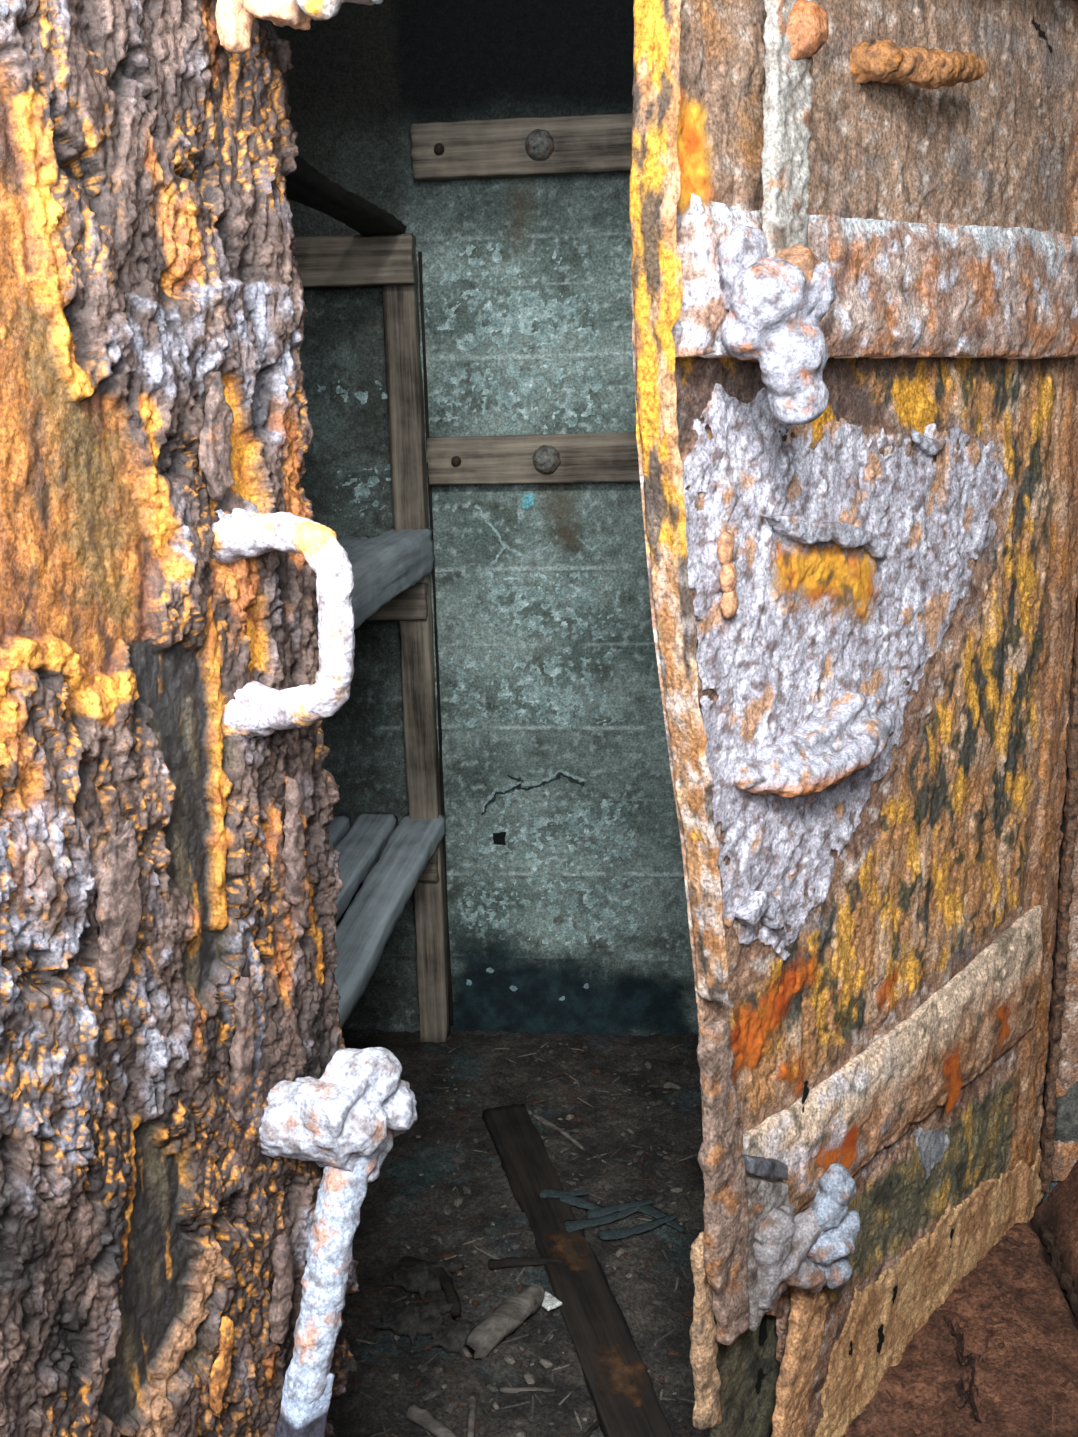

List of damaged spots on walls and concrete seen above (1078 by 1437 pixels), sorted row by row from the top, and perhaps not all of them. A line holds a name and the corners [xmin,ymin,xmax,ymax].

corrosion [676,94,712,212]
corrosion [774,542,875,620]
crack [481,769,586,815]
water stain [450,939,695,1037]
corrosion [730,958,815,1082]
corrosion [877,970,898,1007]
corrosion [997,1006,1010,1046]
corrosion [778,1064,803,1096]
corrosion [943,1044,962,1114]
corrosion [816,1126,858,1173]